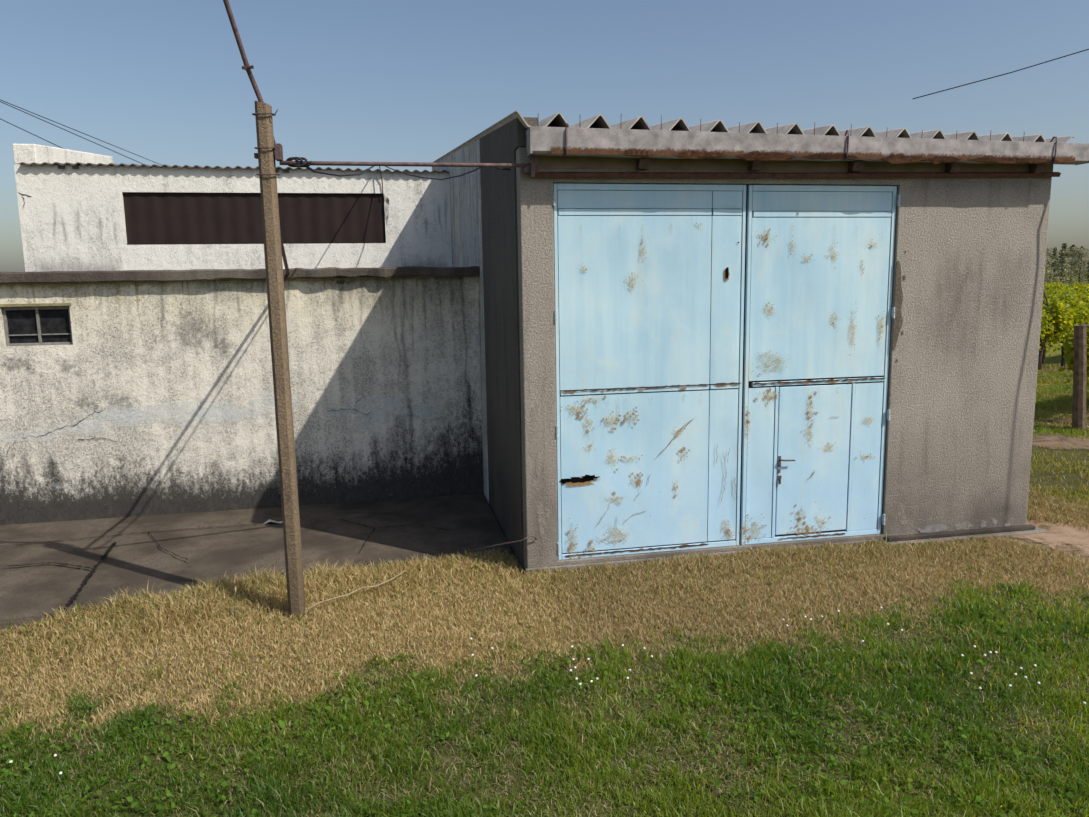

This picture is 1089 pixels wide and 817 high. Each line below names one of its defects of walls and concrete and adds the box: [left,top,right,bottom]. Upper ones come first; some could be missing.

rust [744,353,885,444]
crack [6,410,115,459]
water stain [297,400,484,506]
rust [560,382,740,487]
water stain [0,458,282,525]
peeling [562,475,598,487]
rust [565,518,708,560]
rust [722,514,767,543]
rust [778,504,846,540]